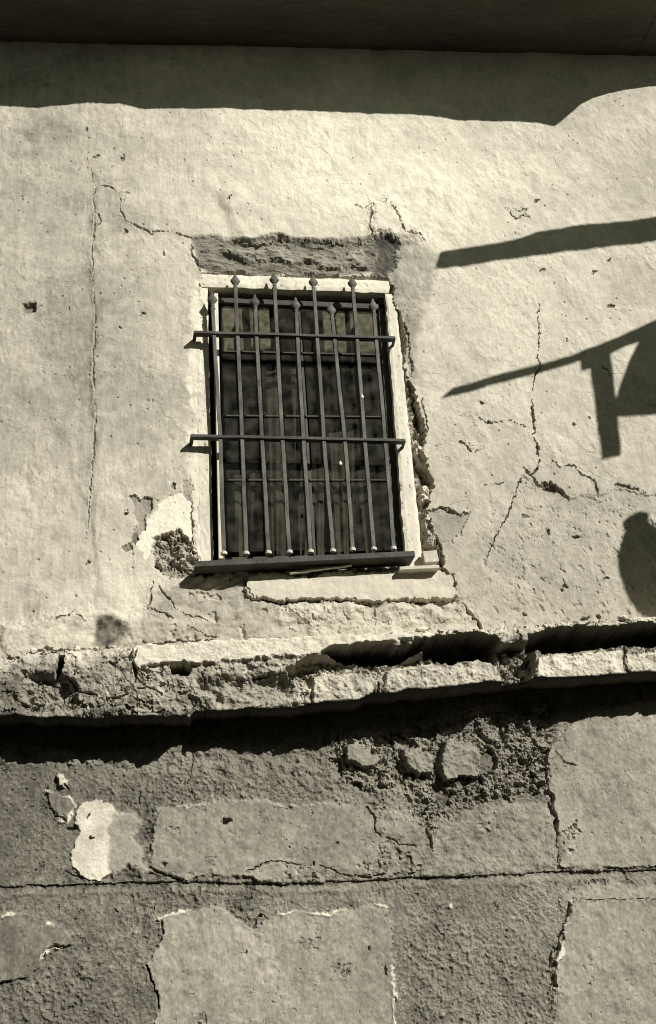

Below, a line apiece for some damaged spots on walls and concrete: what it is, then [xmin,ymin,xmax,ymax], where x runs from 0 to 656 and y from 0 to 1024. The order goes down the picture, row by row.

crack [233,196,426,276]
crack [85,157,203,546]
crack [476,302,647,556]
spalling [188,233,656,719]
flaking render [121,479,197,558]
spalling [23,657,77,716]
spalling [170,660,192,676]
flaking render [48,699,656,882]
crack [532,748,579,870]
crack [57,867,105,884]
crack [148,865,185,884]
crack [245,859,386,883]